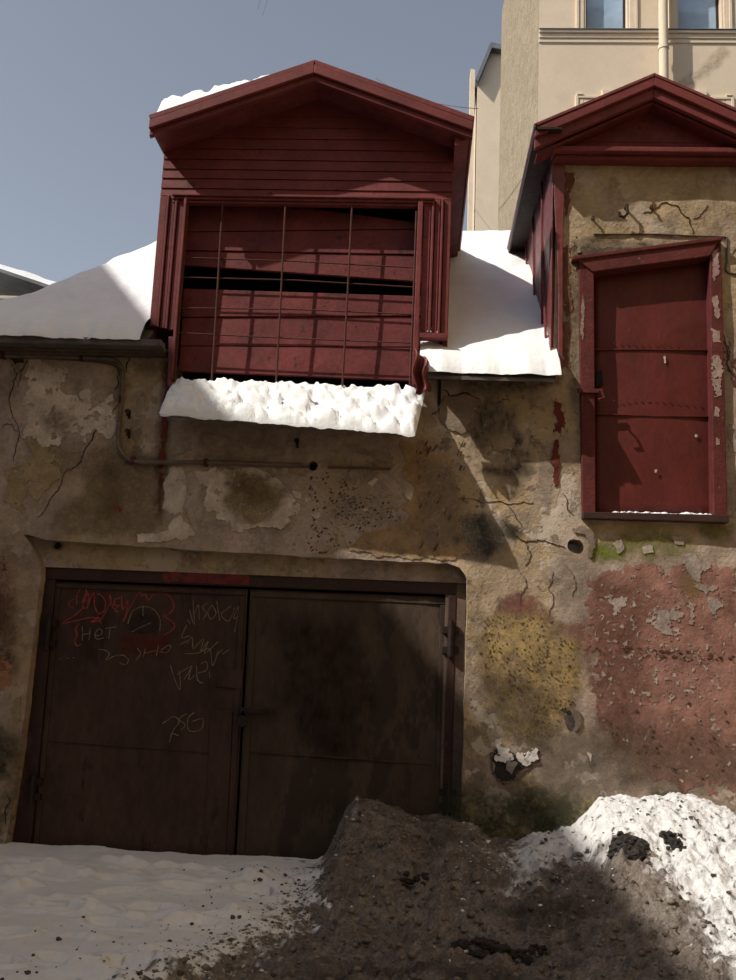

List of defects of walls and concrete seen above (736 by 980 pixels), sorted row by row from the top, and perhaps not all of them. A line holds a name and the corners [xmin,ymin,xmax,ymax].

peeling [711,249,720,281]
crack [3,360,28,459]
peeling [11,359,117,447]
peeling [711,296,736,417]
crack [38,429,97,517]
leakage [455,514,520,562]
crack [458,498,576,618]
peeling [475,536,736,800]